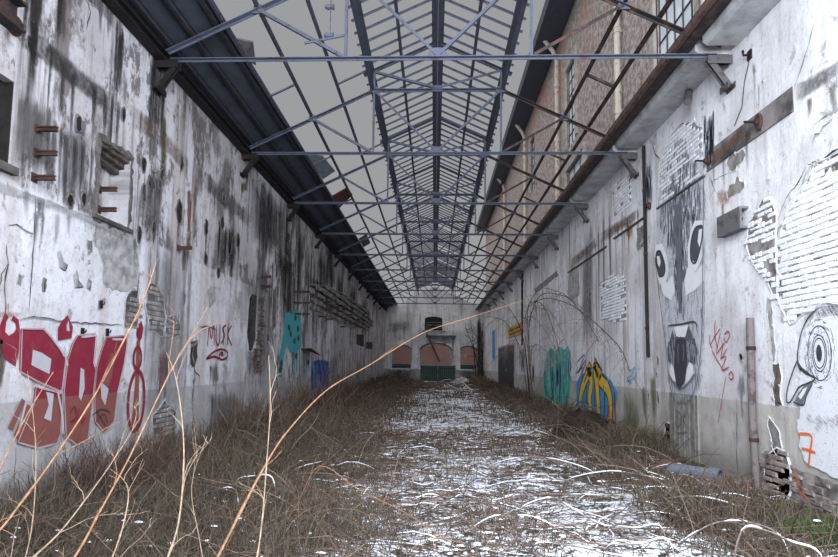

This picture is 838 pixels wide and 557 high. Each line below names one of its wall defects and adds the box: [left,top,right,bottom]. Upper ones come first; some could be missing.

damp [18,0,124,194]
flaking render [659,118,703,204]
crack [774,108,838,245]
flaking render [65,132,182,340]
flaking render [175,190,192,271]
flaking render [189,338,198,368]
damp [208,175,372,358]
flaking render [309,283,372,350]
flaking render [534,264,626,323]
flaking render [743,151,838,408]
flaking render [759,416,838,517]